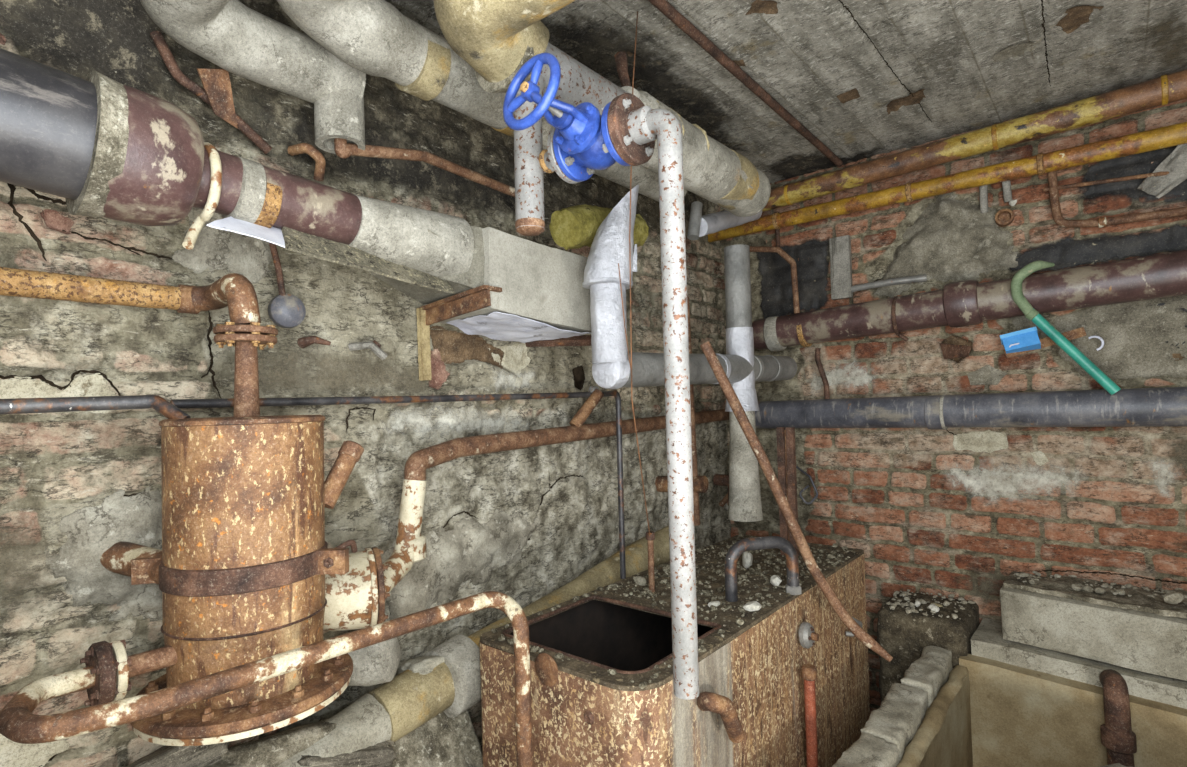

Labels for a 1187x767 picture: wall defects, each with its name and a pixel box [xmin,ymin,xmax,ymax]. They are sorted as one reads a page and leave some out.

crack [1041,0,1051,87]
water stain [685,90,744,142]
crack [7,183,174,261]
flaking render [0,373,116,399]
crack [0,370,121,396]
spalling [942,335,1007,385]
spalling [1010,295,1187,379]
spalling [953,430,1008,453]
spalling [1031,451,1049,466]
flaking render [0,734,70,767]